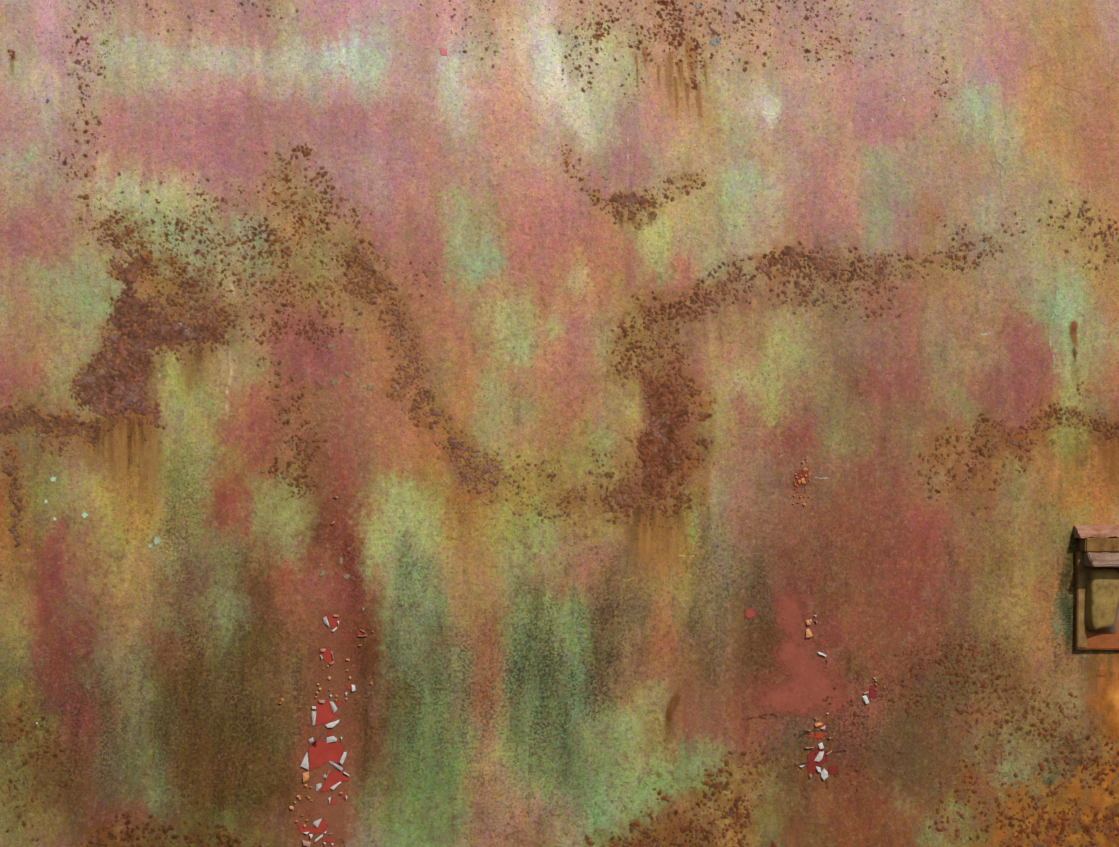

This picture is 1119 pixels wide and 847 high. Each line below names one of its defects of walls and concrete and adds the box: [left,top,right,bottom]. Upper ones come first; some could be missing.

rust [0,0,1025,547]
rust [907,382,1119,501]
rust [0,700,78,841]
rust [82,814,262,847]
peeling [290,614,374,847]
rust [666,696,680,735]
rust [609,716,805,847]
peeling [752,589,885,780]
rust [790,632,1119,847]